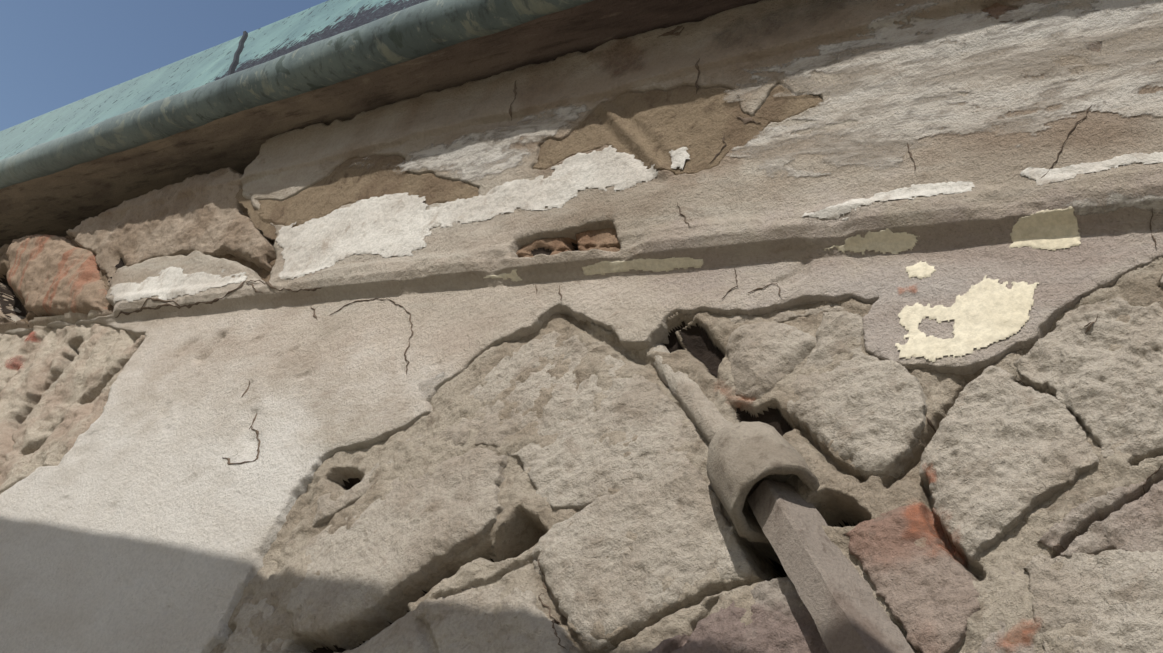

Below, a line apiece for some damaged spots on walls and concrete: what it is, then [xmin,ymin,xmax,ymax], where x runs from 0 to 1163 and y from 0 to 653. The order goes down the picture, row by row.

crack [1041,105,1092,178]
peeling [0,0,1163,494]
crack [115,280,413,375]
crack [222,381,261,465]
flaking render [210,257,1163,653]